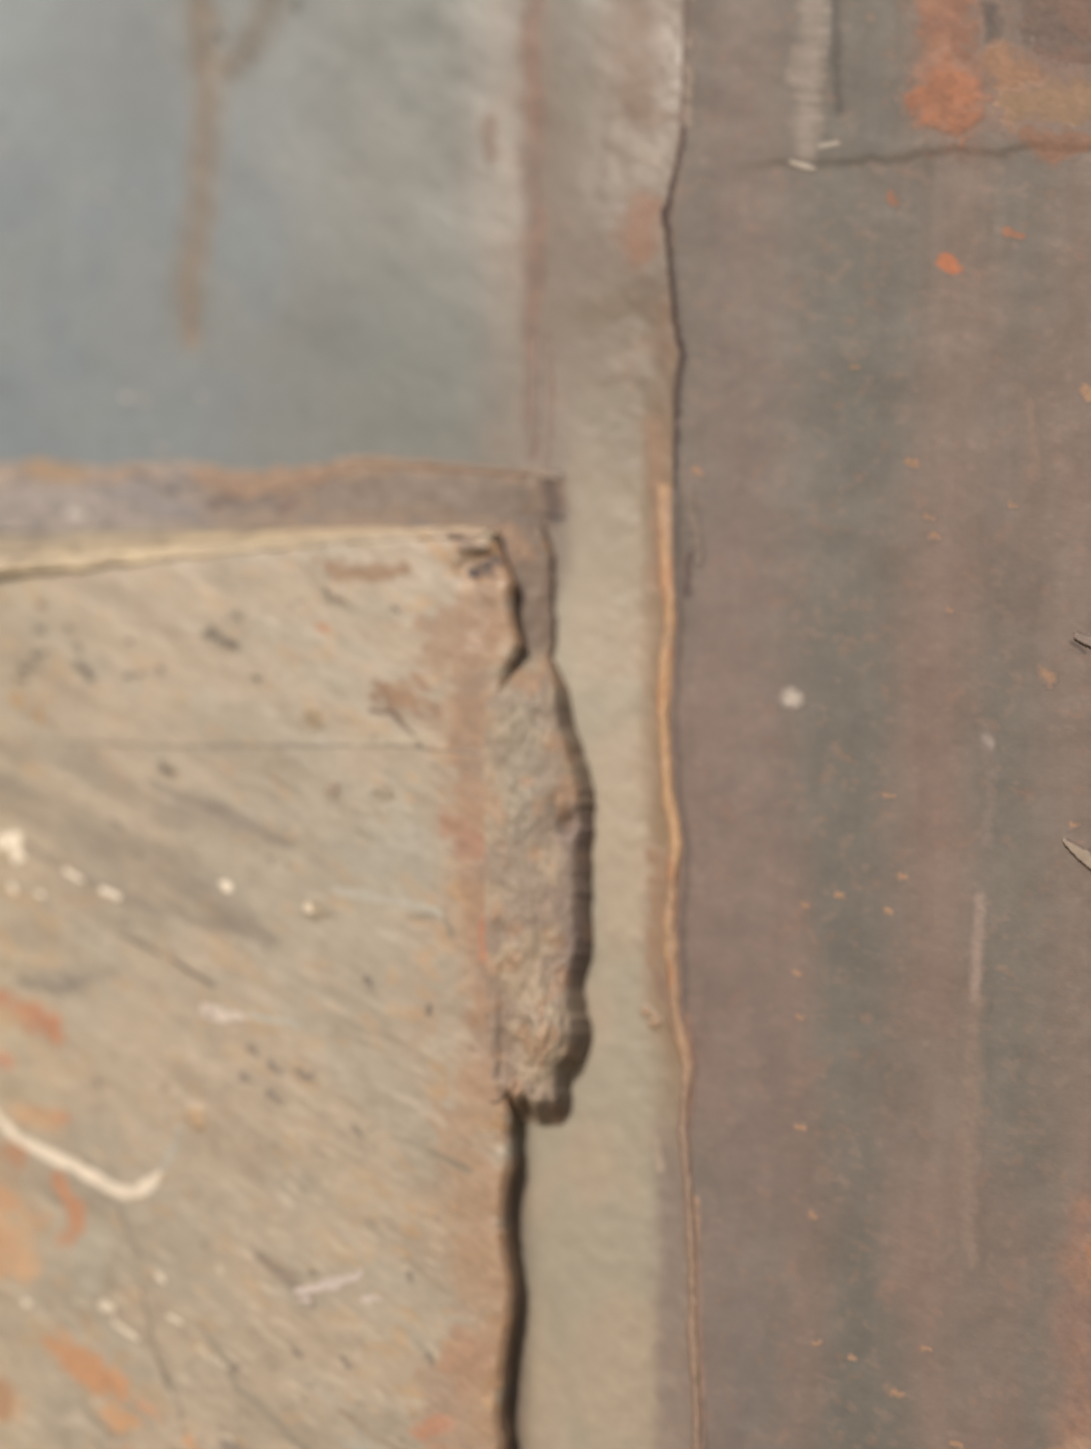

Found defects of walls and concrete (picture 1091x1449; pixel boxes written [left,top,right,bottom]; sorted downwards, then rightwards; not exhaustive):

rust [883,0,1091,174]
crack [660,124,700,1131]